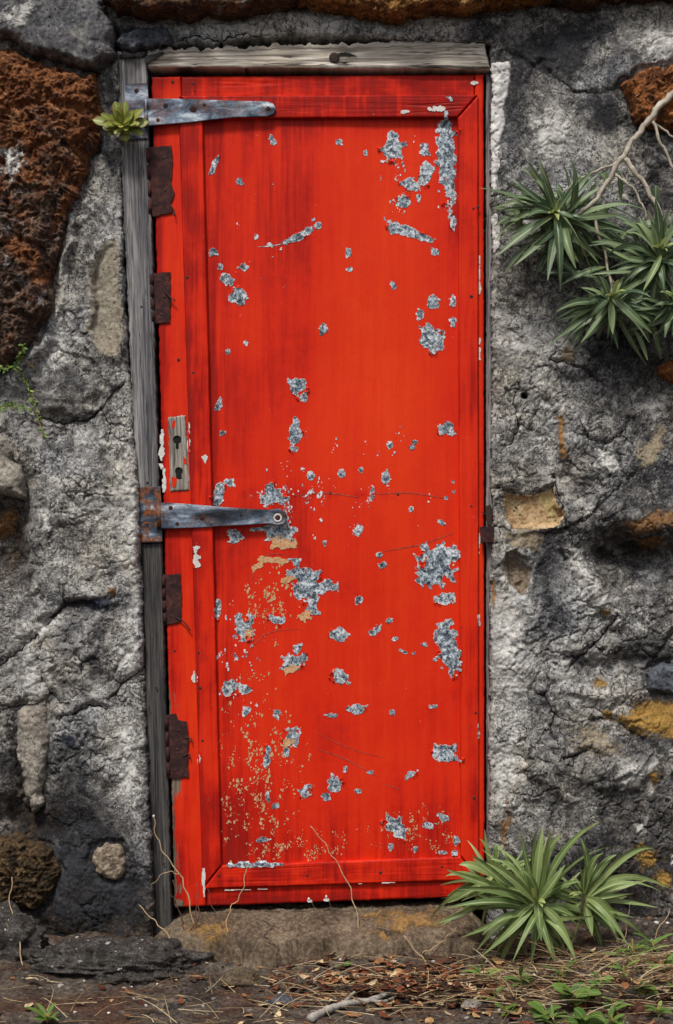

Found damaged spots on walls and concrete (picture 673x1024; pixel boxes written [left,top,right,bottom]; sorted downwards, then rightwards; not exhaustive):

peeling [363,130,407,164]
peeling [396,97,461,232]
peeling [415,294,457,356]
peeling [222,517,338,642]
peeling [413,541,460,605]
crack [0,590,142,721]
peeling [220,679,253,717]
peeling [279,643,308,677]
peeling [392,618,462,680]
crack [535,615,644,767]
peeling [263,710,301,769]
peeling [298,766,362,801]